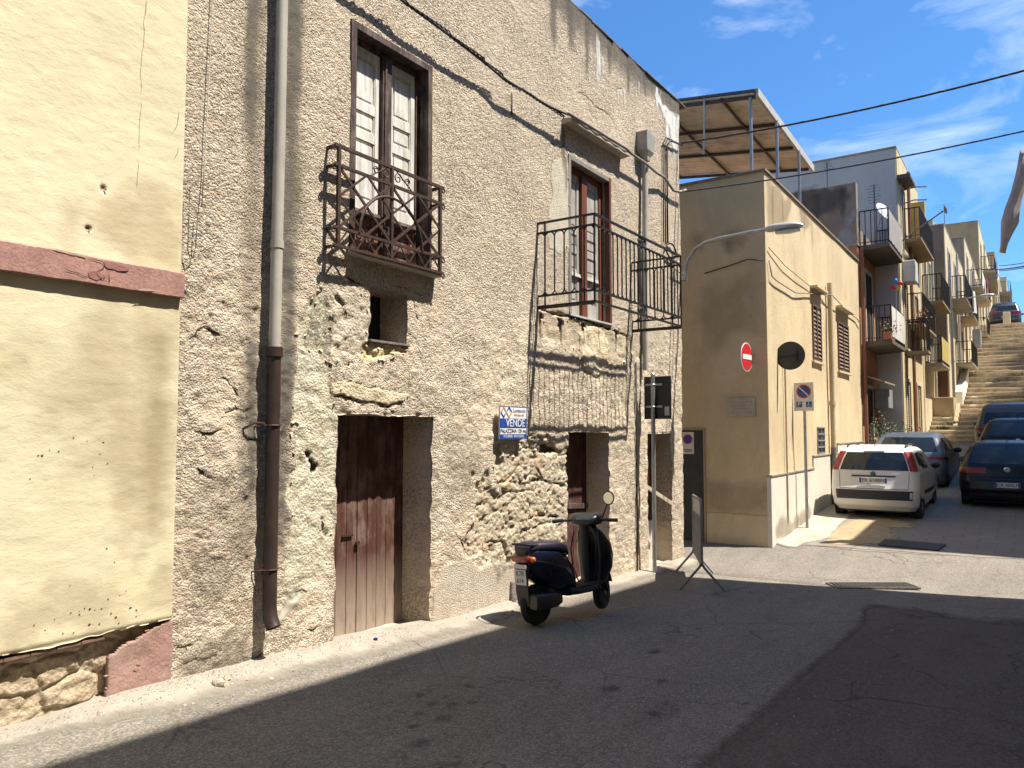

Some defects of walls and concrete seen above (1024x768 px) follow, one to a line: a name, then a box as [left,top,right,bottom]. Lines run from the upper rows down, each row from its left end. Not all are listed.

spalling [542,311,634,379]
peeling [281,279,410,599]
spalling [463,433,568,576]
spalling [0,595,217,727]